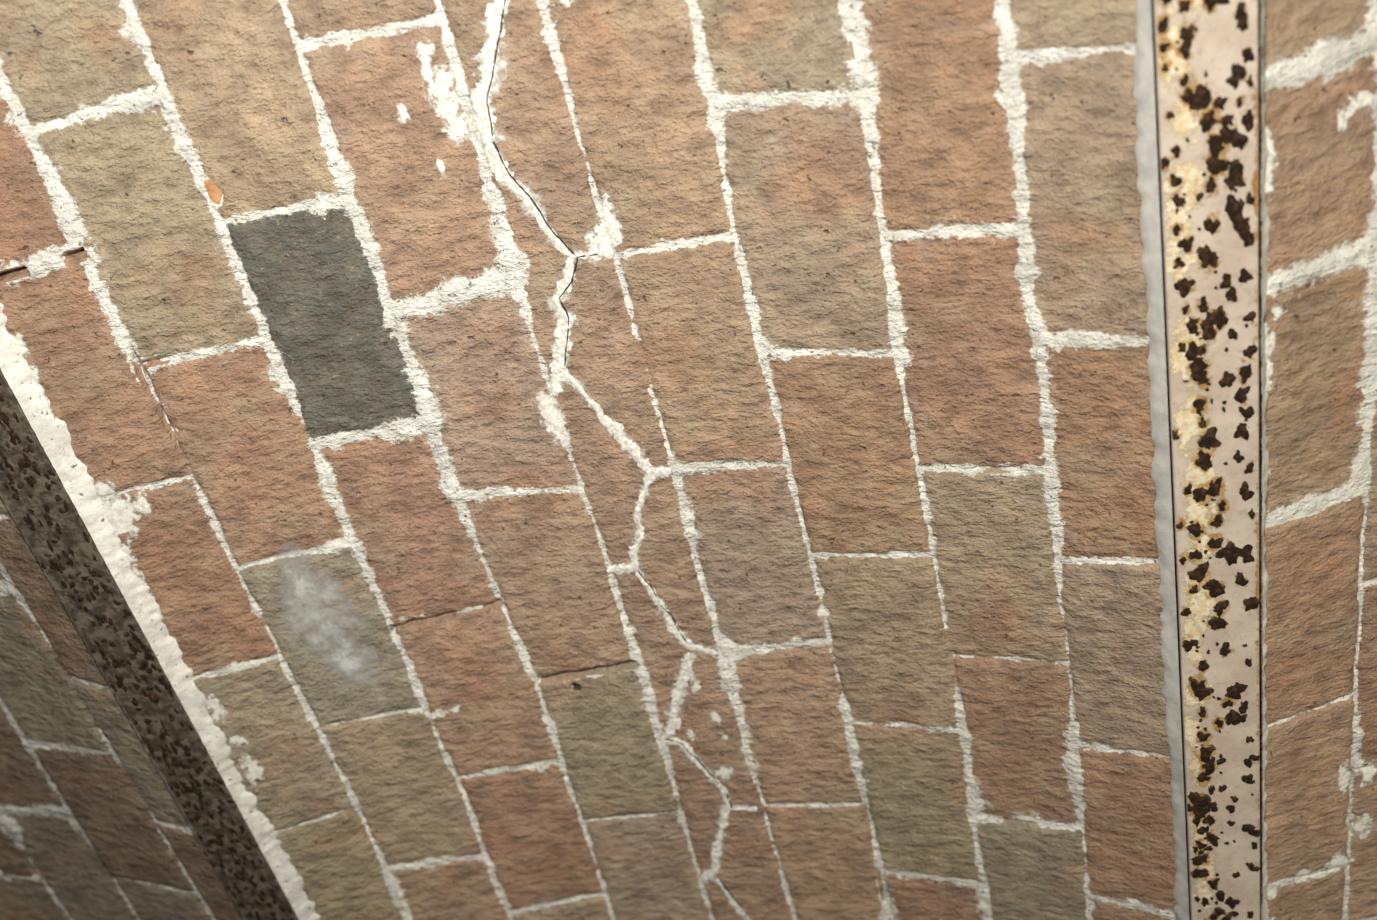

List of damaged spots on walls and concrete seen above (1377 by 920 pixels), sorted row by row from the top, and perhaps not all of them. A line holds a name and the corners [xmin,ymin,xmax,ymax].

efflorescence [285,560,377,680]
crack [464,0,757,920]
rust [1157,0,1260,920]